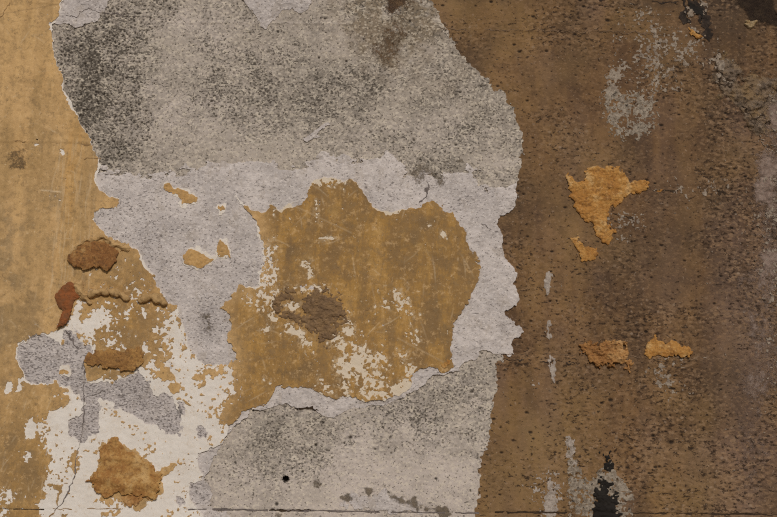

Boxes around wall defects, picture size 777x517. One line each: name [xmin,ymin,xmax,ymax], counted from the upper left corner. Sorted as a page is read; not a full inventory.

water stain [737,0,777,26]
peeling [0,0,525,517]
water stain [738,91,777,353]
crack [188,507,572,515]
spalling [565,436,634,517]
crack [633,509,777,517]